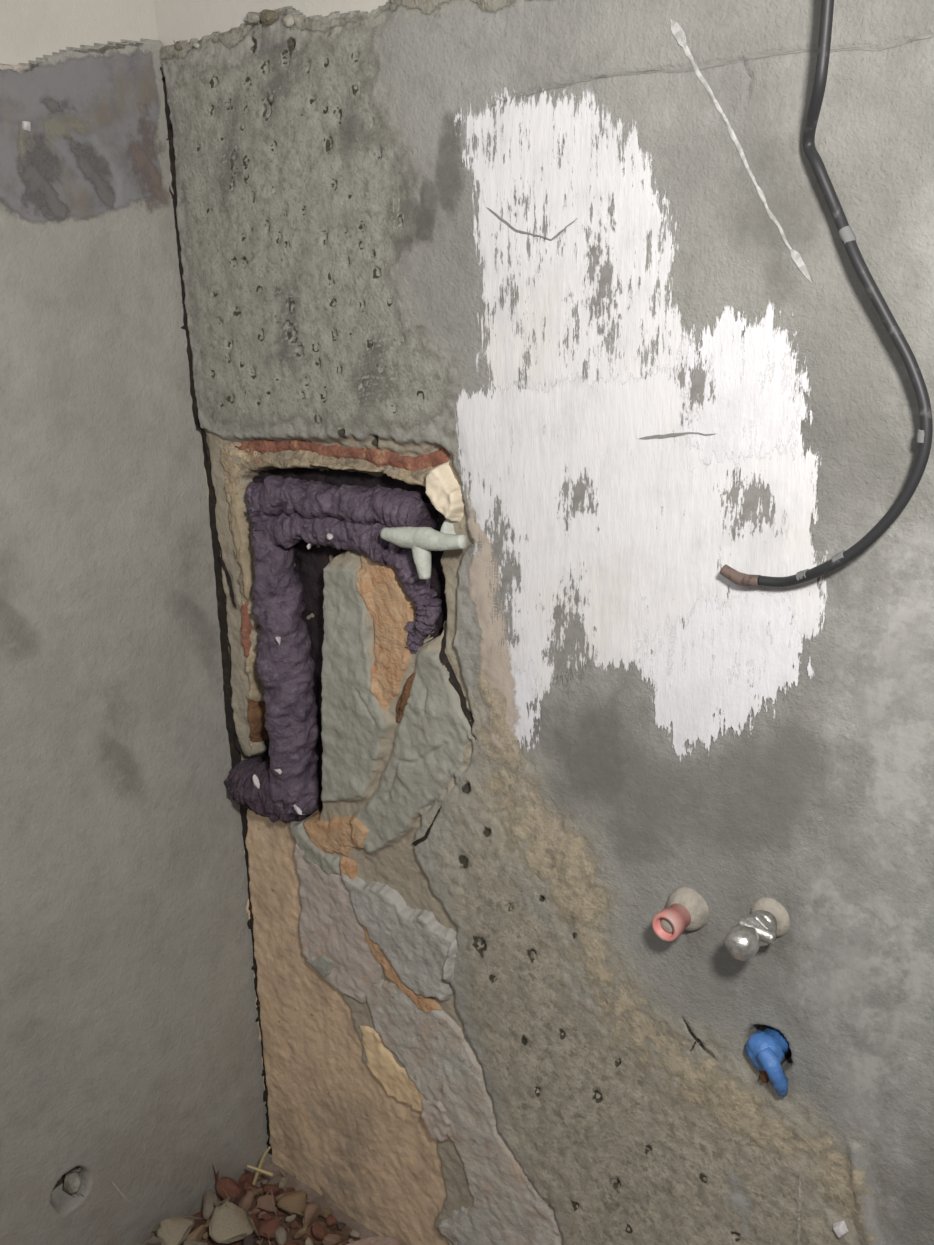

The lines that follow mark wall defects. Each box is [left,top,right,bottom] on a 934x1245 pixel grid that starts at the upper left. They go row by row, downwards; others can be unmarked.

spalling [71,42,143,54]
spalling [670,20,686,49]
crack [490,35,934,107]
spalling [160,0,466,534]
spalling [790,249,812,283]
flaking render [241,600,261,657]
crack [439,596,476,740]
crack [412,807,441,846]
spalling [243,804,849,1245]